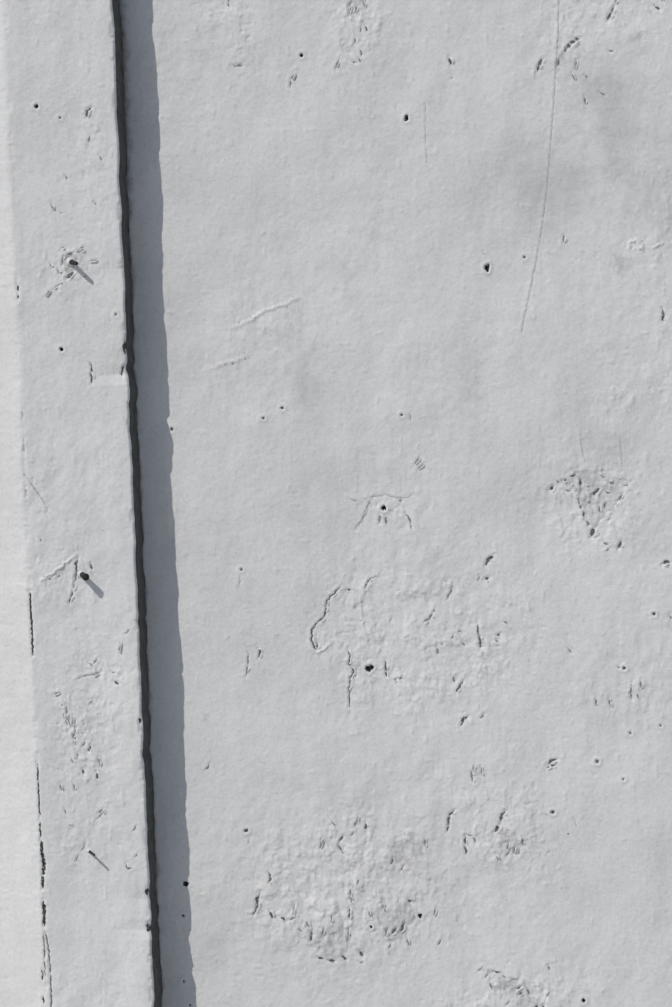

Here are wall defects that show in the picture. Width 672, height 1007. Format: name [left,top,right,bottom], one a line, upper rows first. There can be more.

crack [311,577,376,650]
crack [348,651,357,707]